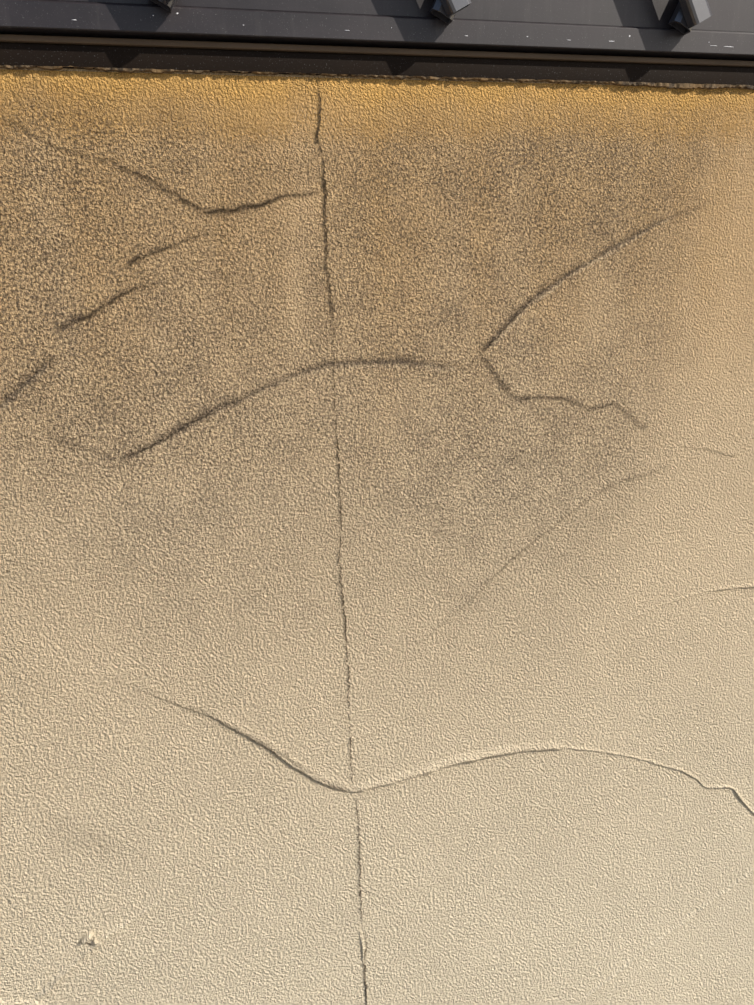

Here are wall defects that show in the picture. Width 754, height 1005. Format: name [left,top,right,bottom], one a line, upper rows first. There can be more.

leakage [0,69,754,131]
leakage [0,192,100,371]
crack [60,287,135,327]
crack [33,91,333,314]
leakage [453,149,648,248]
crack [336,427,353,780]
crack [356,803,368,1005]